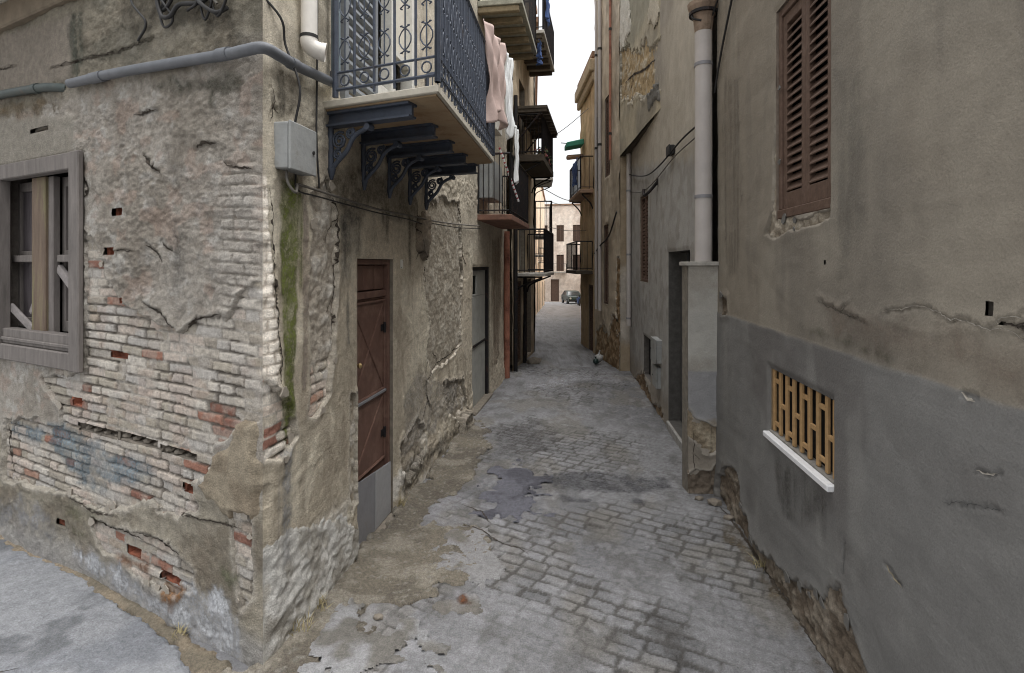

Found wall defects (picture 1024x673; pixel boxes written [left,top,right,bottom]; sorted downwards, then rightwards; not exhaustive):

spalling [619,0,660,105]
crack [196,141,251,169]
spalling [768,188,831,238]
crack [888,305,1024,340]
flaking render [6,233,295,606]
spalling [443,378,468,420]
spalling [400,424,424,479]
crack [70,498,179,555]
crack [181,512,237,528]
spalling [687,408,867,673]